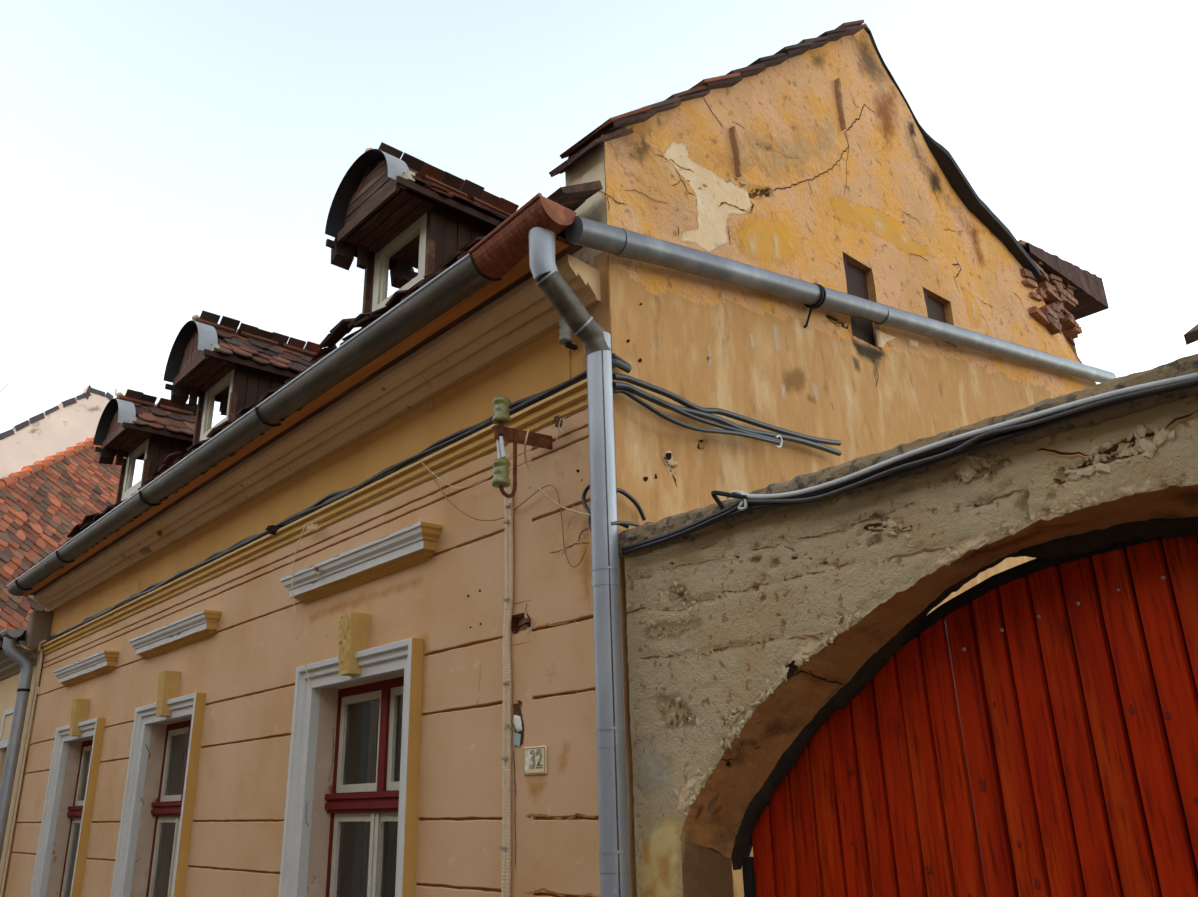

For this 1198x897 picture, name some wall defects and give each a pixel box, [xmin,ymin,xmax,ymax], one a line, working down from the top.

crack [772,104,874,195]
flaking render [662,141,775,252]
spalling [864,520,912,539]
spalling [928,425,1175,571]
crack [640,632,830,659]
crack [792,670,844,686]